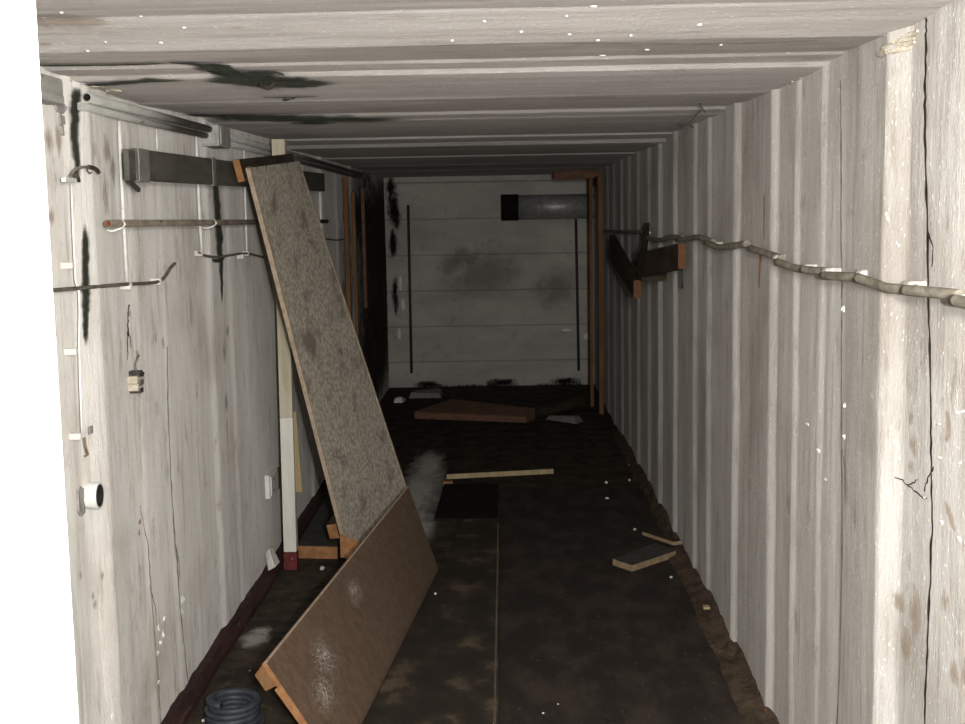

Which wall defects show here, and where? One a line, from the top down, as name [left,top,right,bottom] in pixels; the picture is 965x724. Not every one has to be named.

leakage [47,78,177,172]
leakage [39,62,330,100]
leakage [81,229,90,342]
leakage [212,185,224,299]
leakage [340,170,400,399]
crack [895,17,934,724]